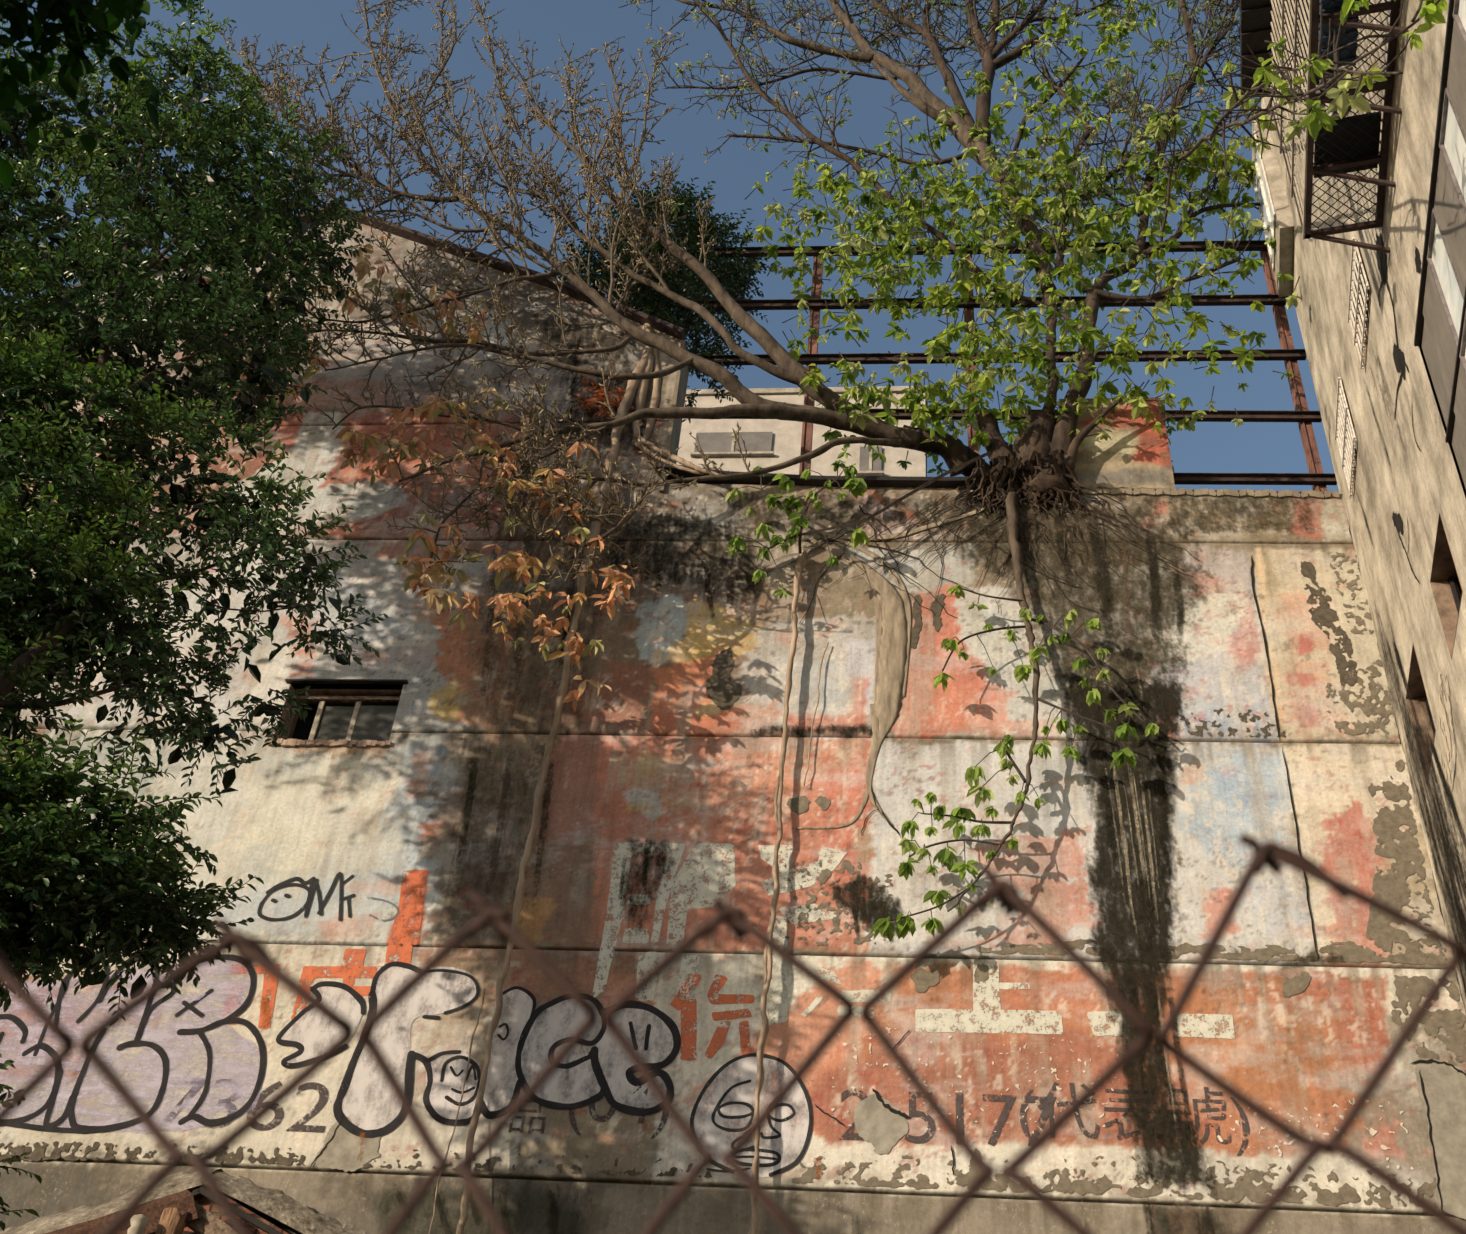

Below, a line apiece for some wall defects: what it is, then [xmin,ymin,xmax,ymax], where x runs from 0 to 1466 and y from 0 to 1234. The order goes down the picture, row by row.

spalling [705,644,742,710]
peeling [1300,552,1396,735]
leakage [449,746,553,926]
leakage [484,492,1312,1234]
peeling [784,759,1466,1220]
peeling [0,1141,197,1162]
spalling [215,1115,434,1172]
leakage [374,1181,590,1234]
peeling [452,1152,712,1178]
crack [1410,1059,1466,1209]